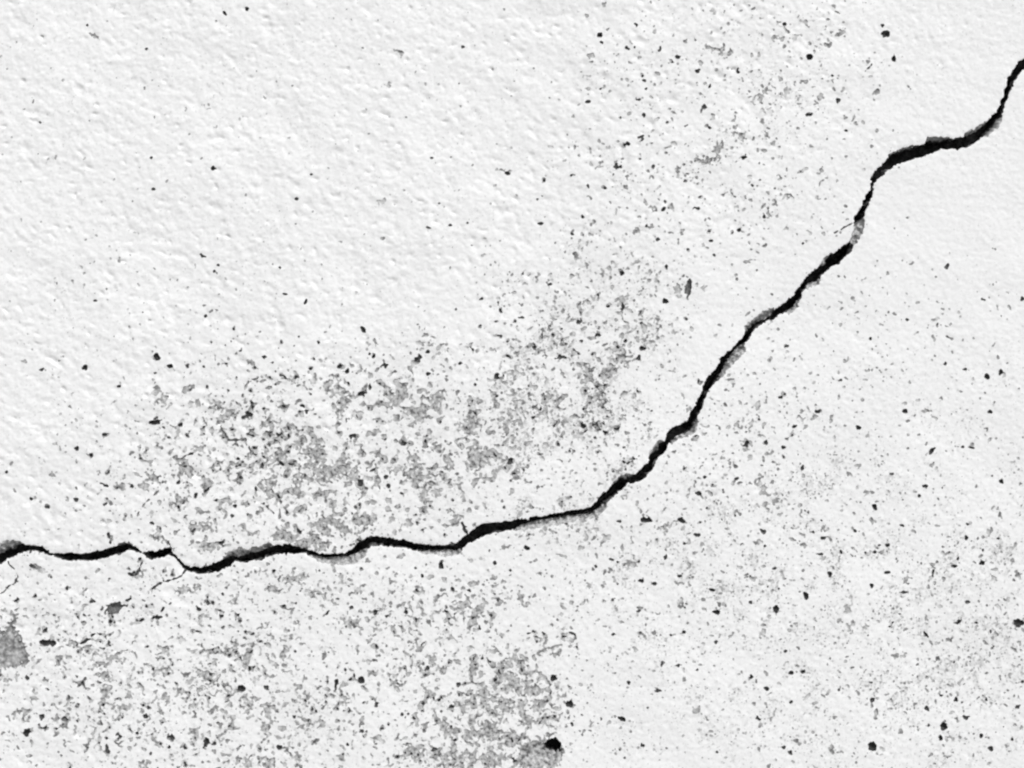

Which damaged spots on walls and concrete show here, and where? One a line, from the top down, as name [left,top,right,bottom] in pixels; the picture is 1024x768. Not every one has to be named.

crack [0,58,1024,619]